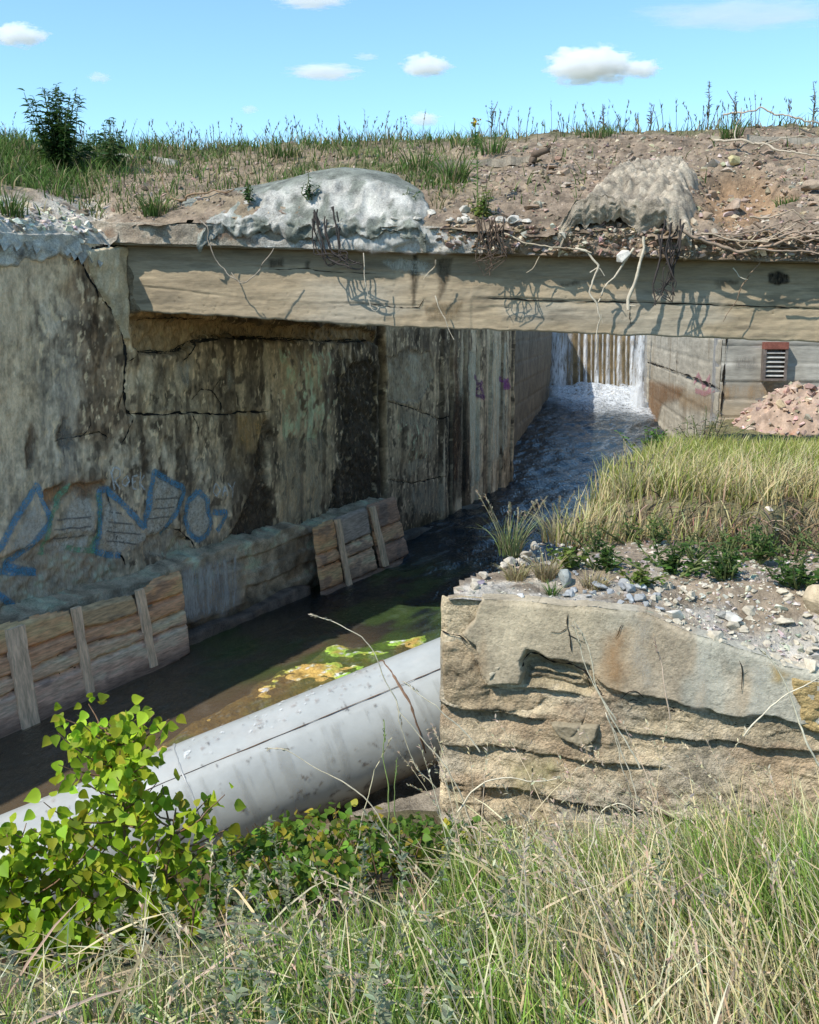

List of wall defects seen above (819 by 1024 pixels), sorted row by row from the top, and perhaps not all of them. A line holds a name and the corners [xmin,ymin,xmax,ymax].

crack [56,244,376,464]